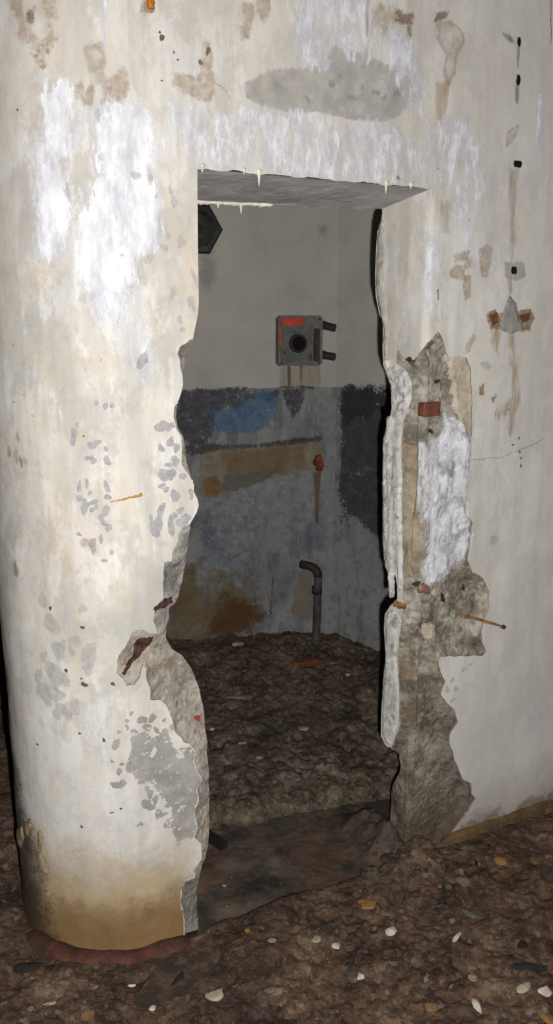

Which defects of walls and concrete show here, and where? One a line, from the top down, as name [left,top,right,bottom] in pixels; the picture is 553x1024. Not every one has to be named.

leakage [32,0,492,384]
spalling [177,339,192,373]
corrosion [487,310,503,329]
corrosion [518,309,535,332]
spalling [335,213,506,845]
spalling [103,385,324,933]
leakage [13,764,185,950]